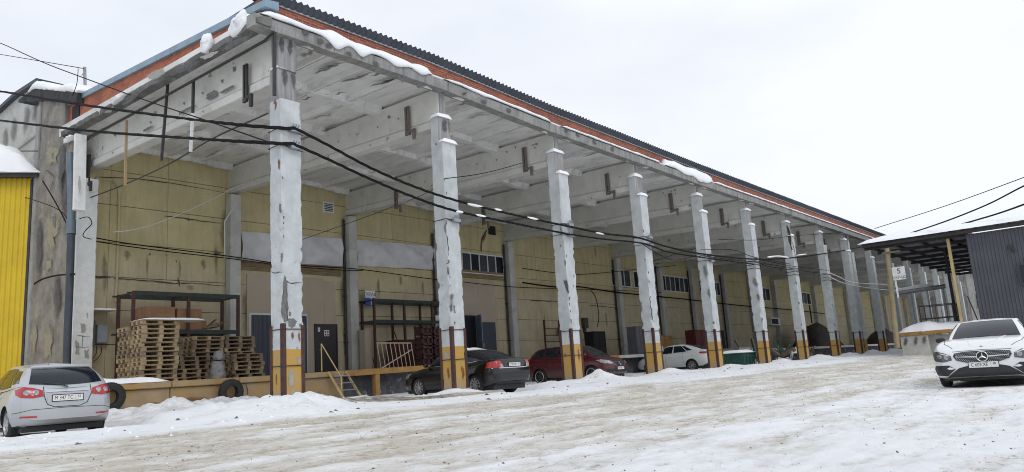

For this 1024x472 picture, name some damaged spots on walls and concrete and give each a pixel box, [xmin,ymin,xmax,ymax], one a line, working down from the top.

water stain [58,144,67,214]
spalling [281,275,302,328]